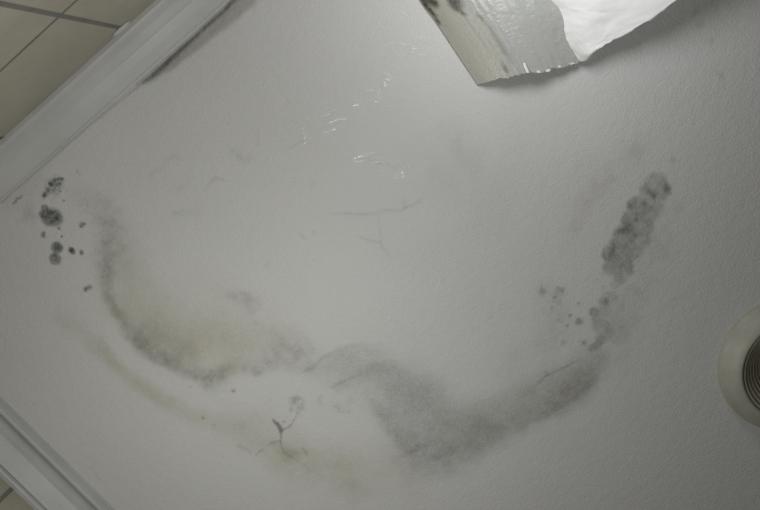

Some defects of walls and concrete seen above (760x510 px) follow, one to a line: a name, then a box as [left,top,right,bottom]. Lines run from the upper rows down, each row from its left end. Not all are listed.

peeling [420,0,676,85]